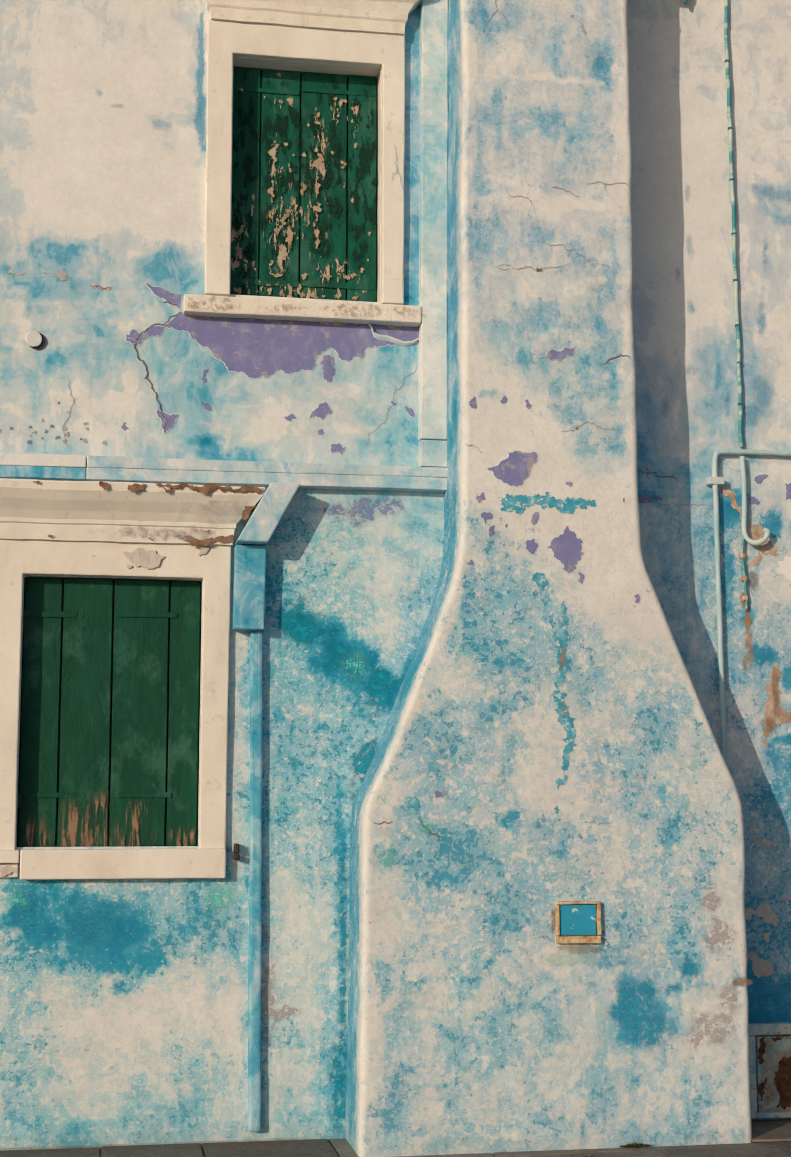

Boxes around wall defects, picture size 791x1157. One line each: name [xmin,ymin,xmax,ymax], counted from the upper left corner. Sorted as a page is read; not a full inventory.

crack [498,243,597,272]
peeling [128,282,419,383]
crack [125,301,181,435]
peeling [284,402,346,455]
spalling [128,483,266,521]
spalling [176,530,233,556]
peeling [476,450,596,584]
spalling [721,474,791,581]
spalling [762,663,791,749]
spalling [745,894,788,943]
corrosion [758,1036,784,1064]
corrosion [758,1057,791,1112]